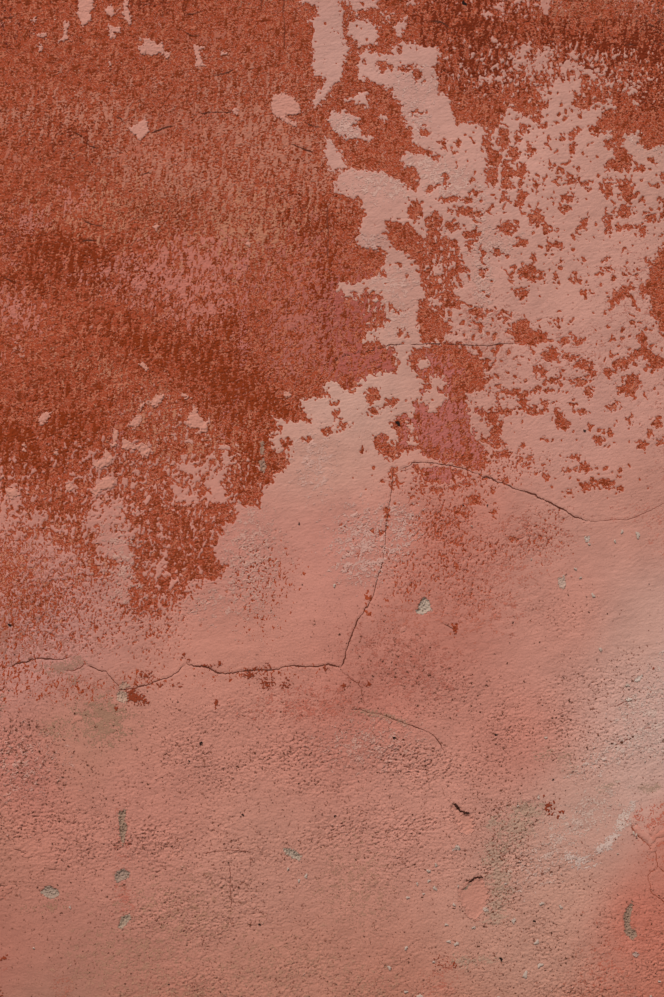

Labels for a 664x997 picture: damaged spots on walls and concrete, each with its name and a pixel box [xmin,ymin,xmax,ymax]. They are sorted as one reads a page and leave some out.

crack [0,462,663,753]